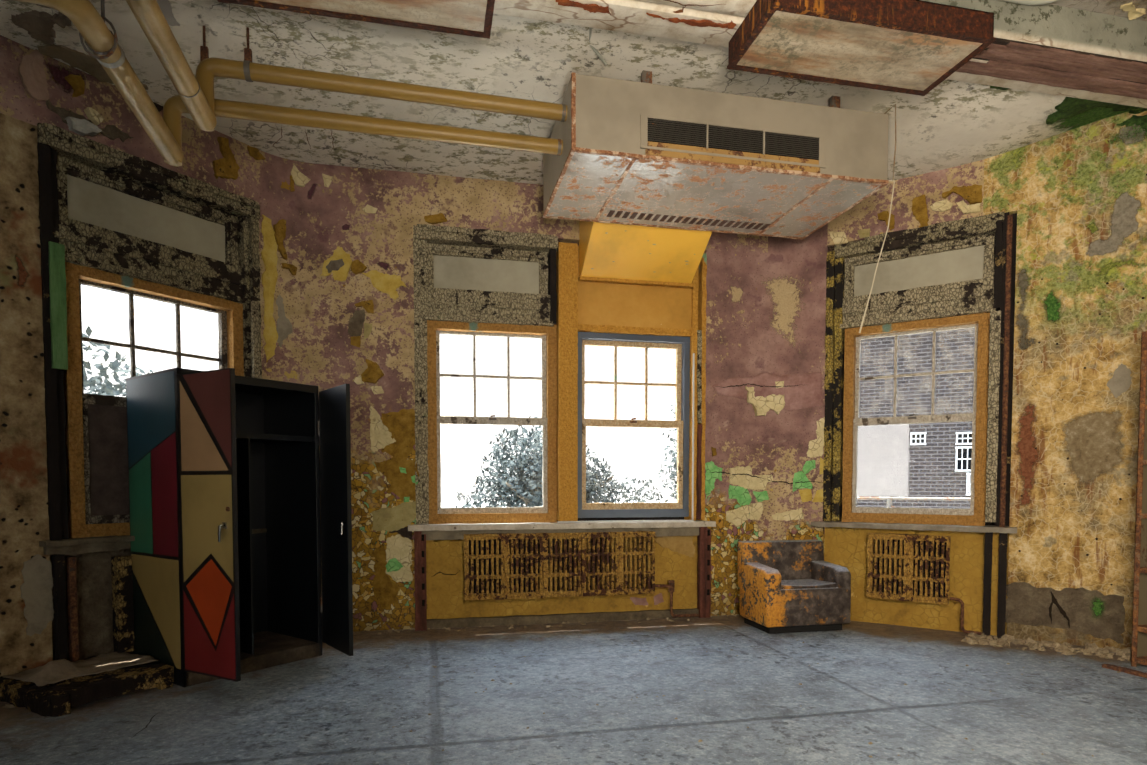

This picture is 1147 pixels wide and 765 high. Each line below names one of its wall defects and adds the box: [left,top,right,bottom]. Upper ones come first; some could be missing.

rust [556,0,611,15]
rust [646,12,736,29]
crack [665,0,721,13]
peeling [1120,2,1146,20]
flaking render [11,4,134,142]
peeling [212,137,240,180]
peeling [290,165,333,192]
peeling [261,214,297,361]
peeling [761,276,805,347]
leakage [1016,269,1035,350]
peeling [745,381,785,416]
peeling [705,417,825,527]